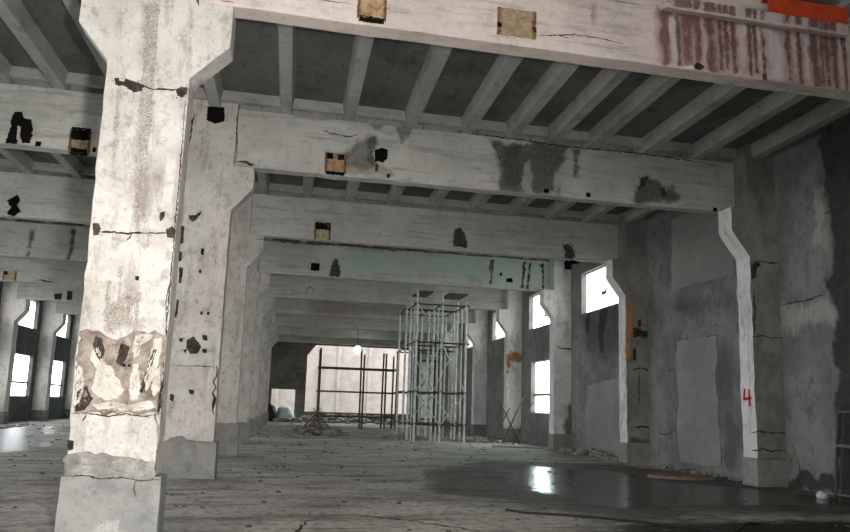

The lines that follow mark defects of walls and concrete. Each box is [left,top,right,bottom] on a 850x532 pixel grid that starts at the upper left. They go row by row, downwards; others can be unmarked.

corrosion [652,0,850,91]
spalling [7,195,21,216]
spalling [5,111,41,146]
damp [343,123,396,177]
damp [485,137,581,196]
damp [632,172,681,205]
crack [73,86,218,425]
flaking render [73,329,174,415]
spalling [179,335,207,354]
corrosion [505,349,522,374]